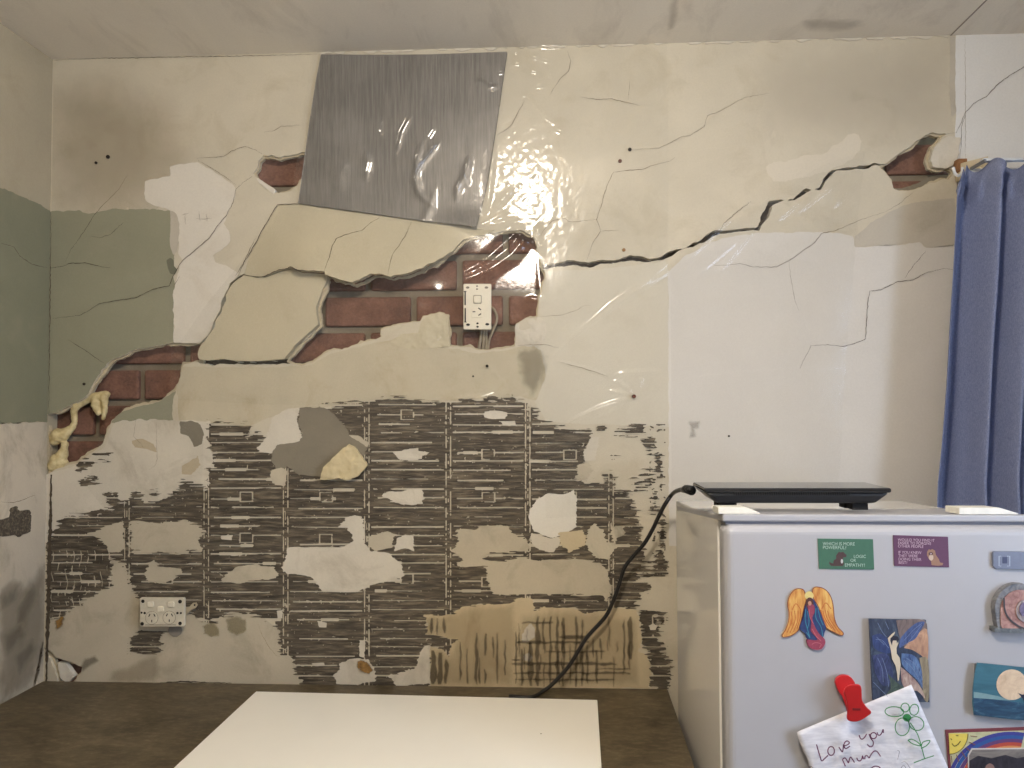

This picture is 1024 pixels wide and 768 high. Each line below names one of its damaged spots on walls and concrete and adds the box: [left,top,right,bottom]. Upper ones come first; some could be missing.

crack [2,126,293,407]
spalling [254,153,305,194]
crack [238,203,380,277]
crack [541,94,871,269]
crack [802,257,953,363]
peeling [879,33,1024,191]
peeling [0,162,955,703]